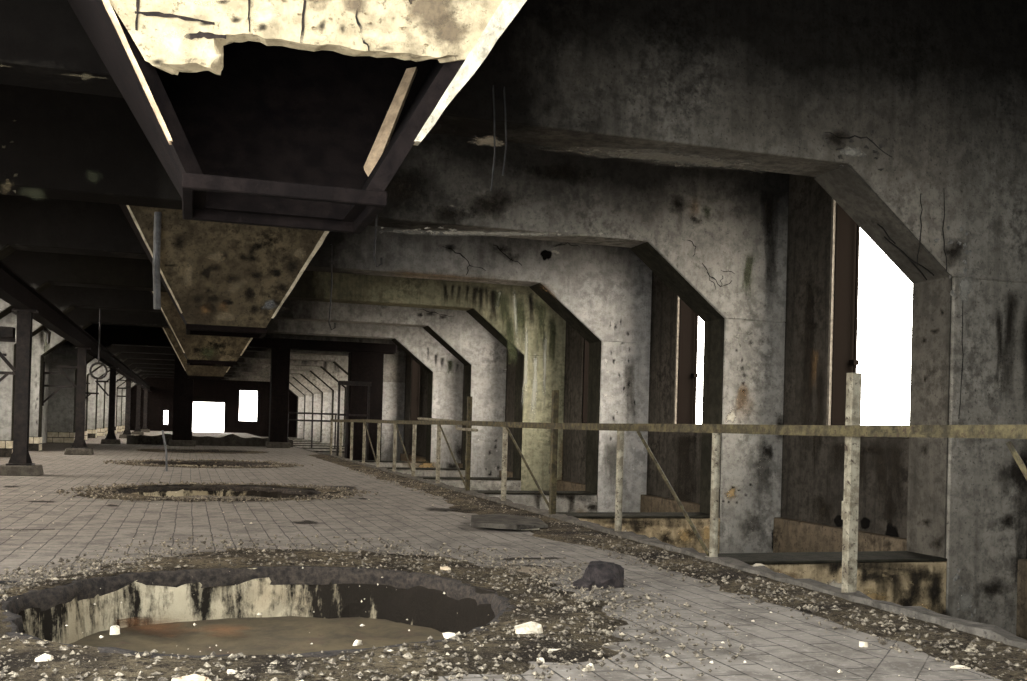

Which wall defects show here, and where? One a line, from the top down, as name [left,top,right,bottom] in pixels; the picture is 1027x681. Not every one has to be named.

crack [135,0,250,40]
peeling [255,7,276,30]
crack [299,0,307,43]
peeling [303,18,344,41]
crack [355,10,370,51]
crack [688,240,735,290]
damp [444,285,556,406]
spalling [117,485,321,499]
damp [605,518,673,543]
damp [823,563,842,574]
damp [857,562,948,616]
spalling [0,566,517,658]